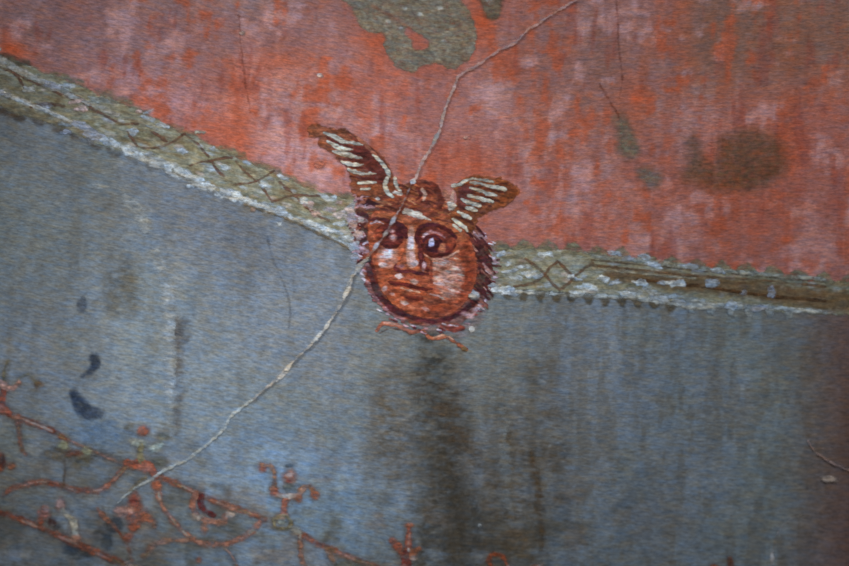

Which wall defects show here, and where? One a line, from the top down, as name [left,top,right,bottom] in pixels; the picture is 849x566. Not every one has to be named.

peeling [343,0,477,72]
peeling [480,0,502,20]
crack [122,0,577,499]